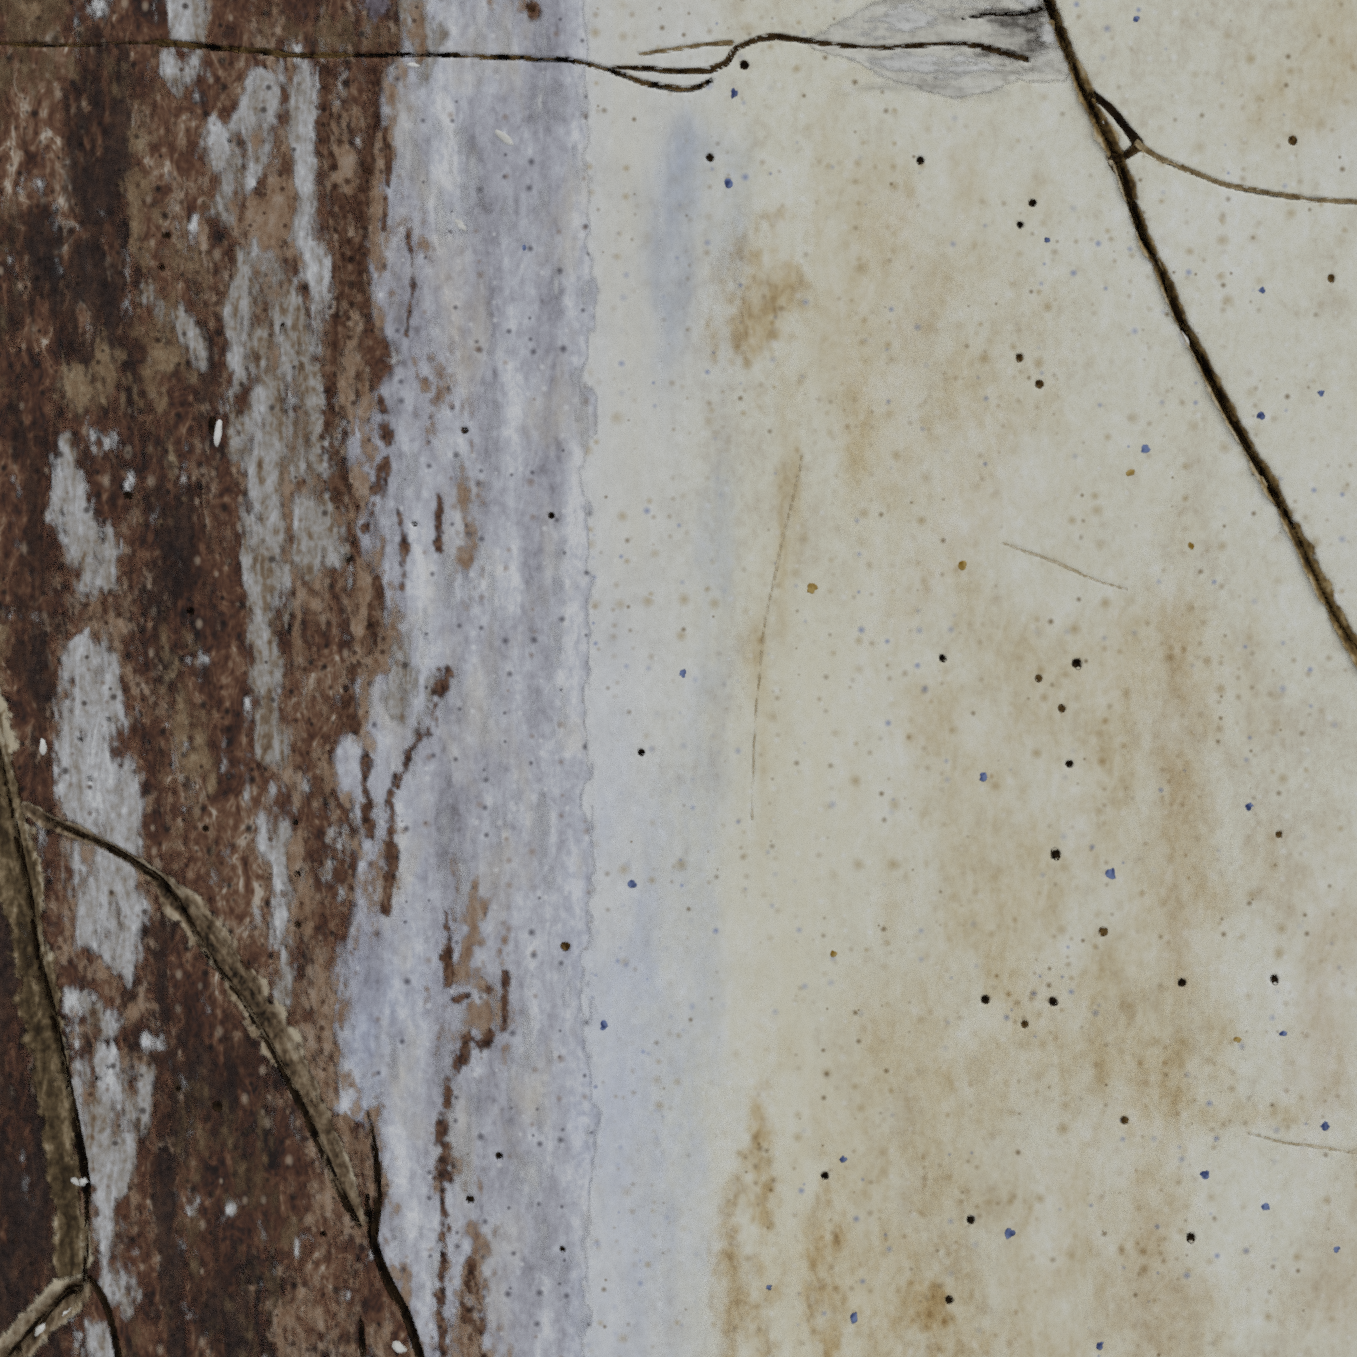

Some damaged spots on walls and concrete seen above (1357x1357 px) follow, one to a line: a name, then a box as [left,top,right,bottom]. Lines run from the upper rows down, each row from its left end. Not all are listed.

crack [0,33,1029,92]
corrosion [517,0,542,20]
spalling [808,0,1069,98]
crack [1044,0,1357,667]
corrosion [0,0,511,1357]
crack [0,694,425,1357]